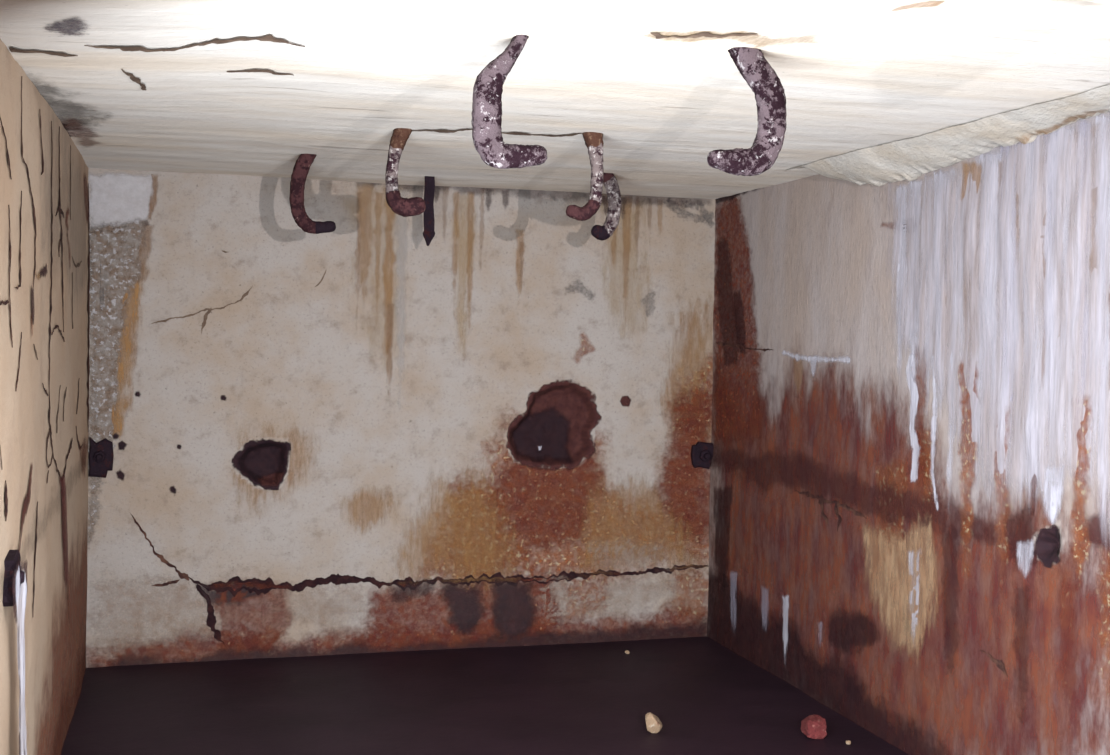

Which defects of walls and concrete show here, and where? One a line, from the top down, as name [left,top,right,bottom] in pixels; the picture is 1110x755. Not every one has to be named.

spalling [87,174,157,541]
crack [0,35,305,612]
spalling [232,439,291,490]
crack [130,513,709,644]
spalling [506,380,602,471]
rust [37,198,1110,755]
water stain [711,115,1110,548]